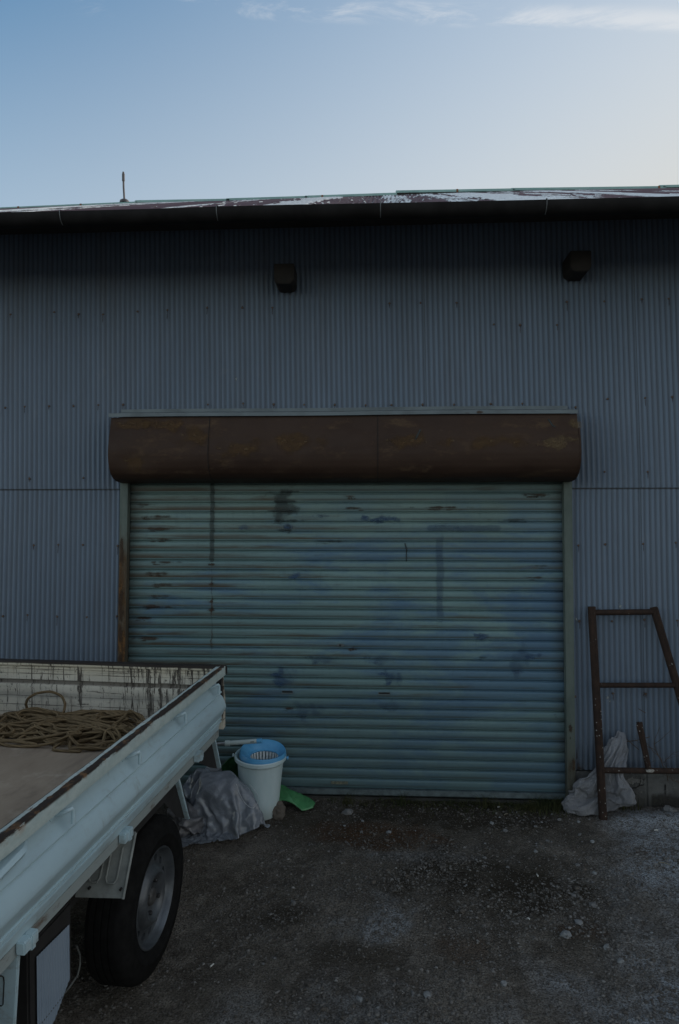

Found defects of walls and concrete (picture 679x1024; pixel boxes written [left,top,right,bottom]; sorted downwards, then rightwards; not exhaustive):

peeling [0,190,679,212]
rust [116,539,126,662]